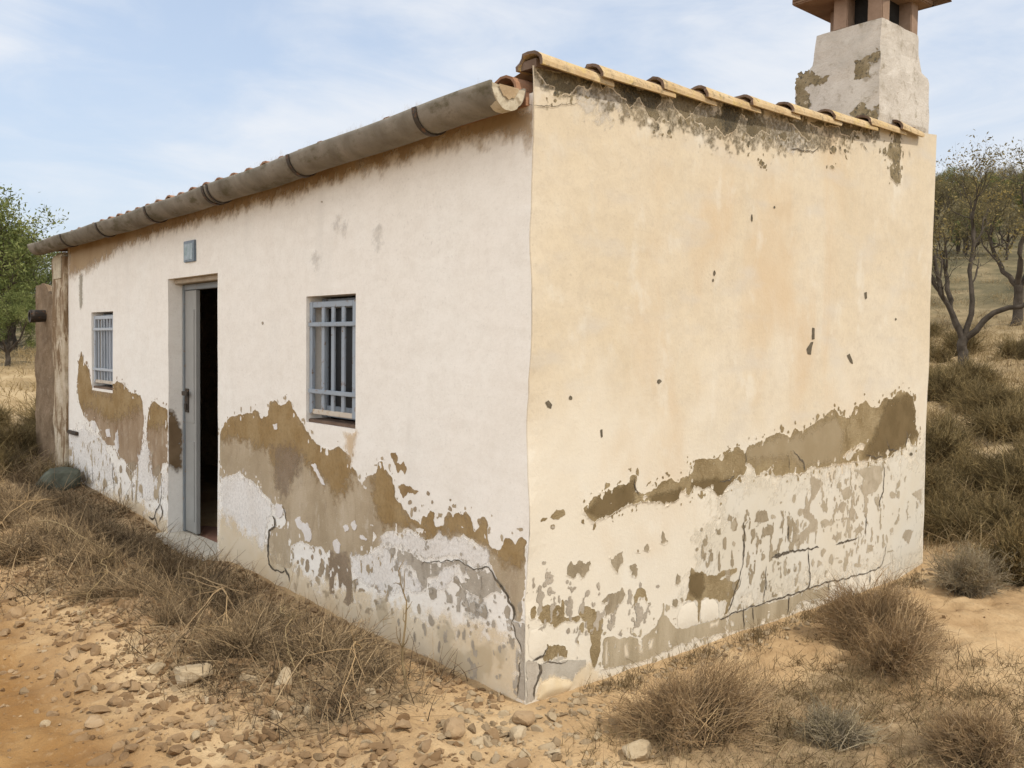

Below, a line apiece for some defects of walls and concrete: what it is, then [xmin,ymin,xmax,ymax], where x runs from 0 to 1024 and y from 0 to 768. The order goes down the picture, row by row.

flaking render [534,68,904,186]
leakage [68,109,533,308]
flaking render [69,350,168,507]
crack [267,508,290,580]
peeling [218,386,926,703]
crack [720,432,908,626]
crack [421,559,567,698]